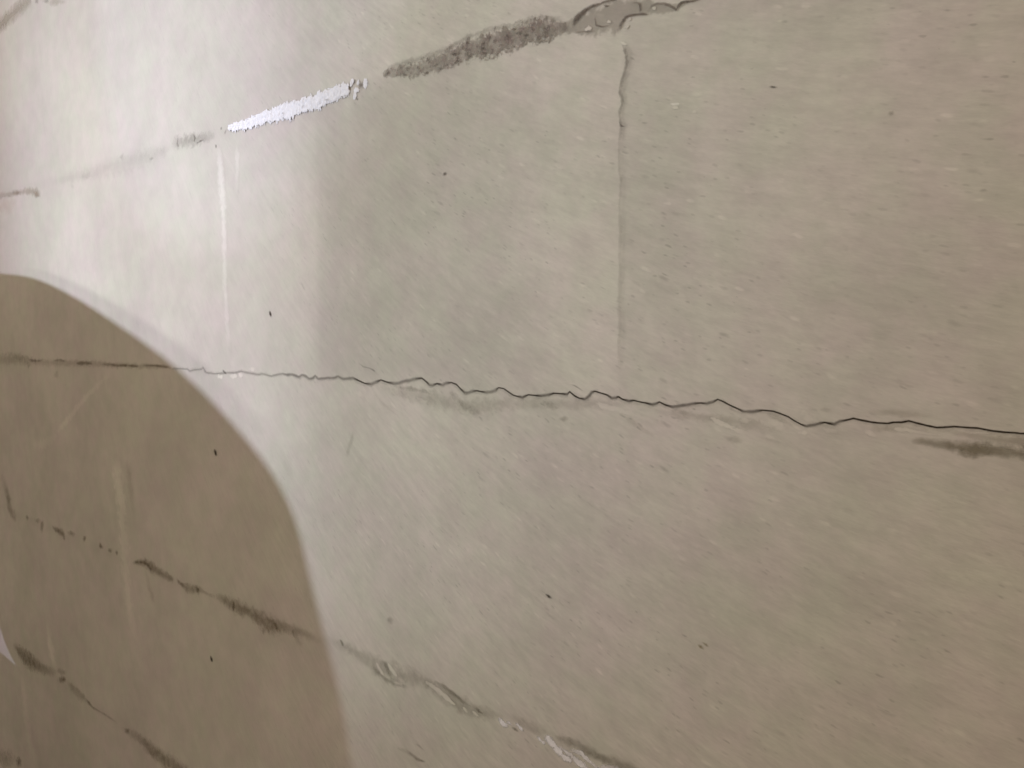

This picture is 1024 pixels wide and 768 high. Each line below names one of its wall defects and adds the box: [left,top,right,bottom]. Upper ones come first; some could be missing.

spalling [386,16,565,77]
crack [418,378,1024,434]